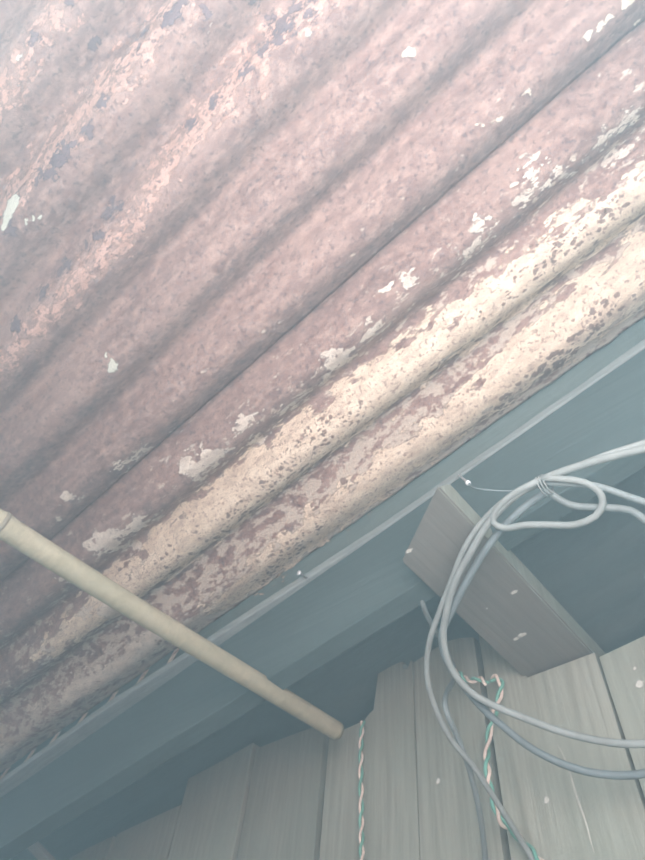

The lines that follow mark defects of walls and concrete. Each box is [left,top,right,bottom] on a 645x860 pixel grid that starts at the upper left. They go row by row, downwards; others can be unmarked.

peeling [582,0,635,41]
peeling [510,105,645,209]
peeling [1,194,20,231]
peeling [454,210,502,265]
peeling [378,268,420,293]
peeling [318,316,386,386]
water stain [103,152,645,619]
spalling [493,283,642,415]
spalling [154,397,364,582]
peeling [82,513,165,557]
water stain [29,591,122,662]
peeling [24,631,173,724]